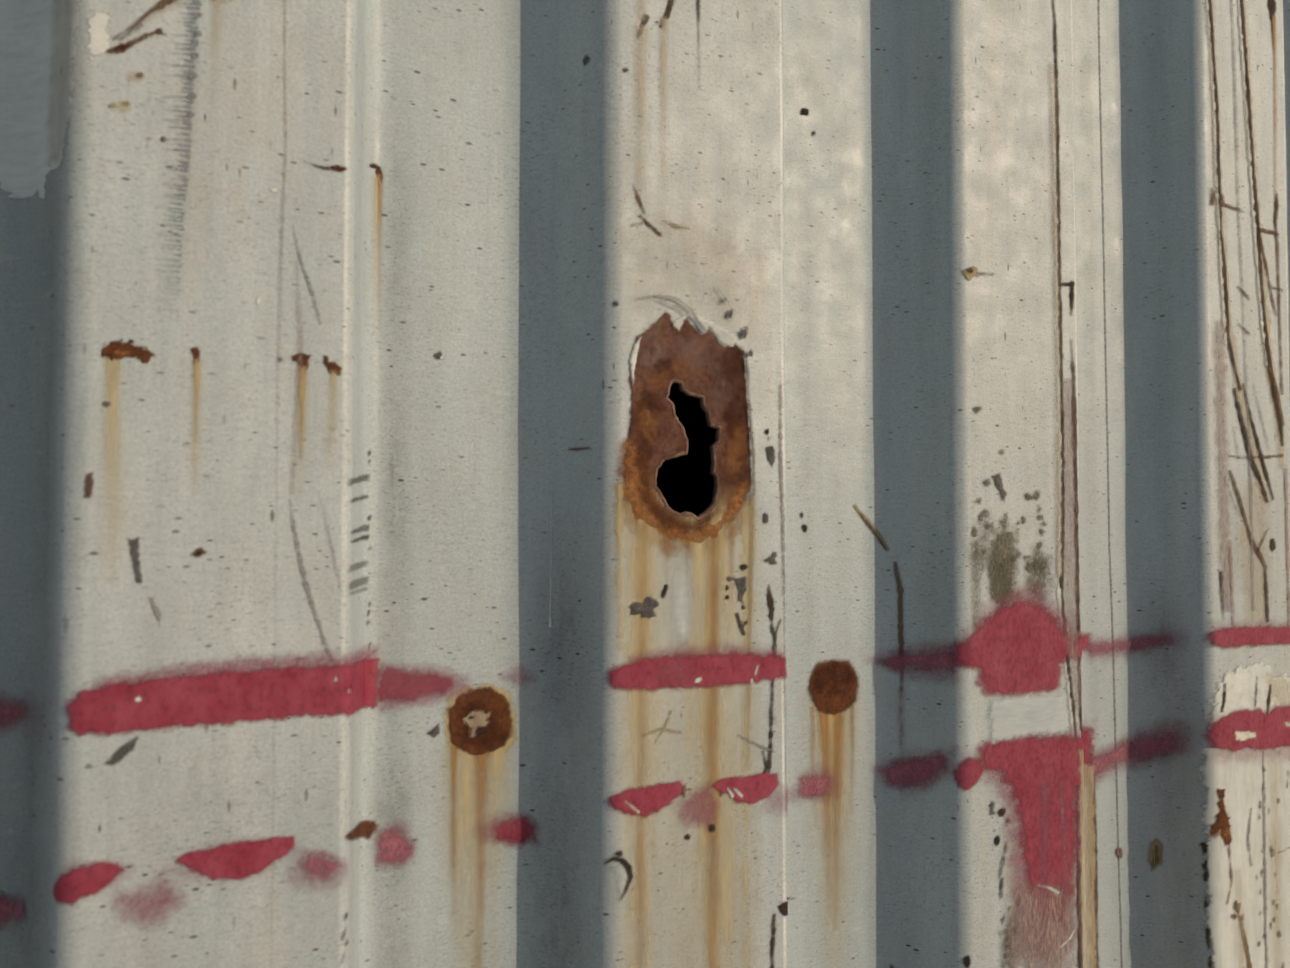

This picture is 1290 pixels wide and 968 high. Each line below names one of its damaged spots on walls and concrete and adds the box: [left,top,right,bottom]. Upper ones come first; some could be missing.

peeling [0,0,81,200]
corrosion [101,339,154,450]
corrosion [191,347,200,388]
corrosion [279,353,342,403]
corrosion [85,473,94,497]
corrosion [446,684,515,842]
corrosion [809,661,858,815]
peeling [1207,661,1290,731]
peeling [1198,731,1290,968]